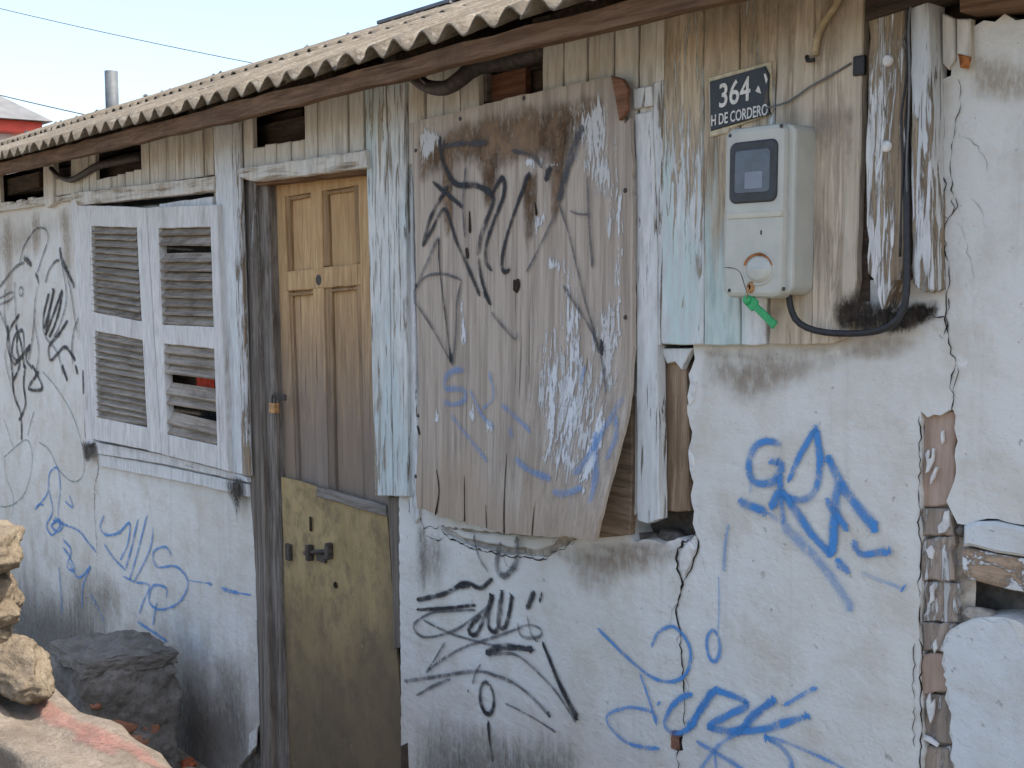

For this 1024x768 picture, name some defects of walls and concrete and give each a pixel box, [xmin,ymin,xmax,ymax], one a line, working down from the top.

peeling [419,94,623,503]
water stain [837,292,937,333]
crack [918,80,987,410]
flaking render [446,527,577,556]
crack [669,530,705,768]
flaking render [921,411,1024,768]